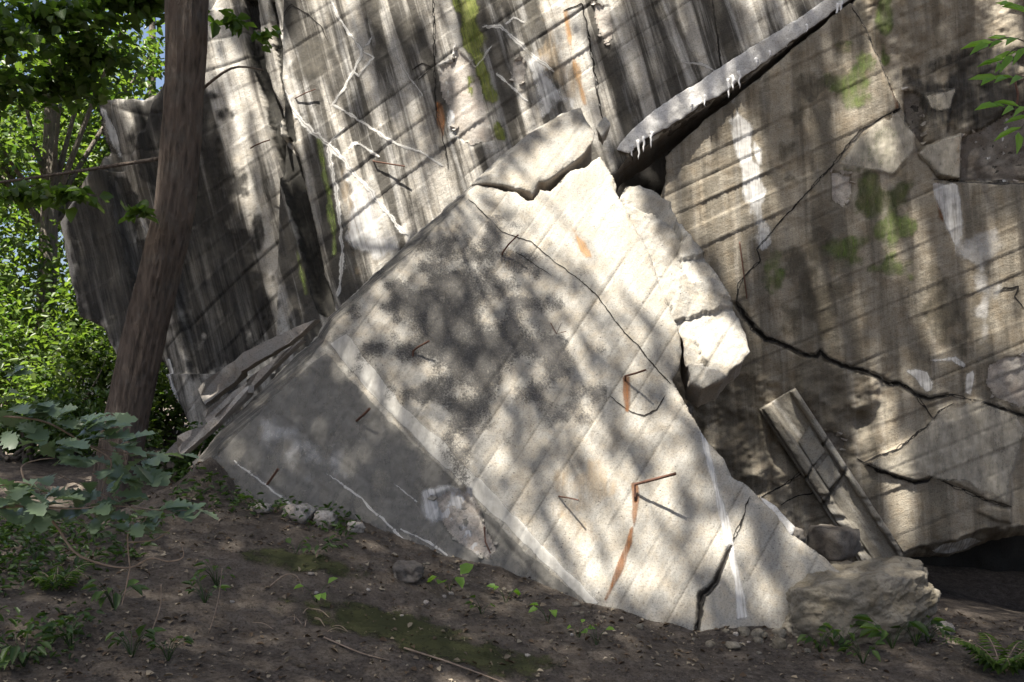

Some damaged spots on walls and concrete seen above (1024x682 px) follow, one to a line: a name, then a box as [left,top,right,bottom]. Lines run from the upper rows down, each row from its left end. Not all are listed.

leakage [170,92,279,383]
leakage [201,0,607,604]
crack [468,199,671,416]
crack [564,3,603,119]
crack [736,8,1024,507]
leakage [842,47,1024,244]
spalling [427,483,498,559]
corrosion [605,483,638,600]
crack [694,471,813,631]